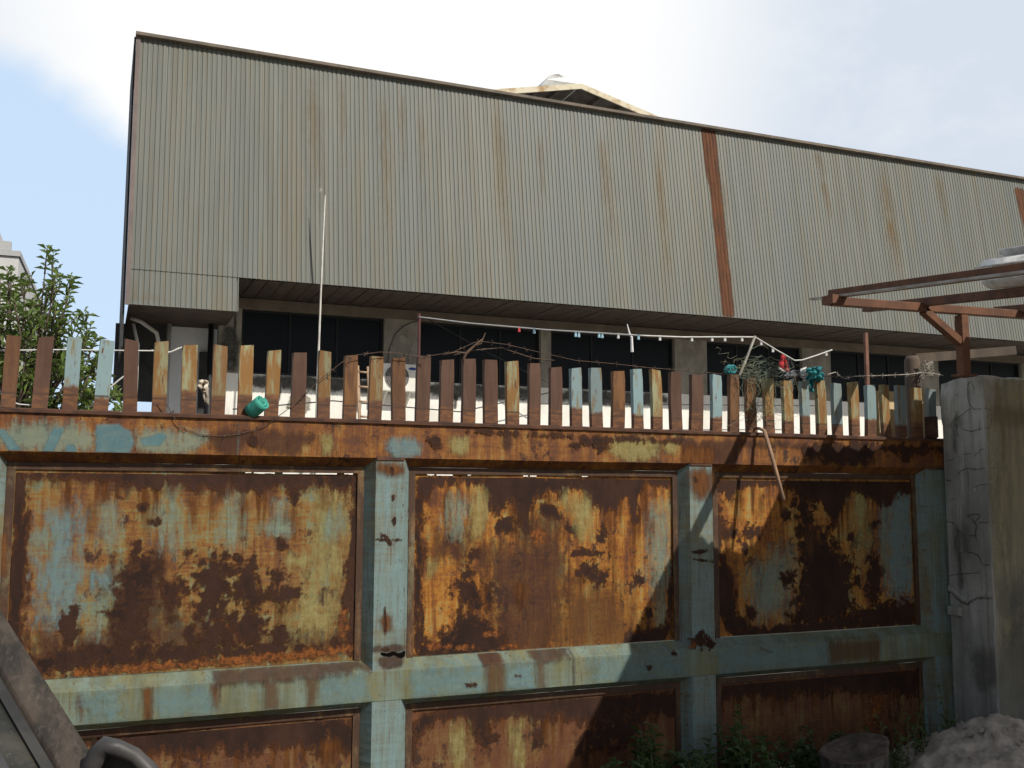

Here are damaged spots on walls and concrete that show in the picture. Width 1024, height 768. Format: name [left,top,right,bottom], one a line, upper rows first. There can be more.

corrosion [701,128,734,317]
corrosion [211,429,315,456]
corrosion [426,434,444,450]
crack [947,381,994,588]
corrosion [466,428,944,636]
corrosion [0,472,370,708]
corrosion [413,477,673,693]
corrosion [687,630,717,652]
corrosion [116,718,352,768]
corrosion [412,691,674,768]
corrosion [721,669,918,732]